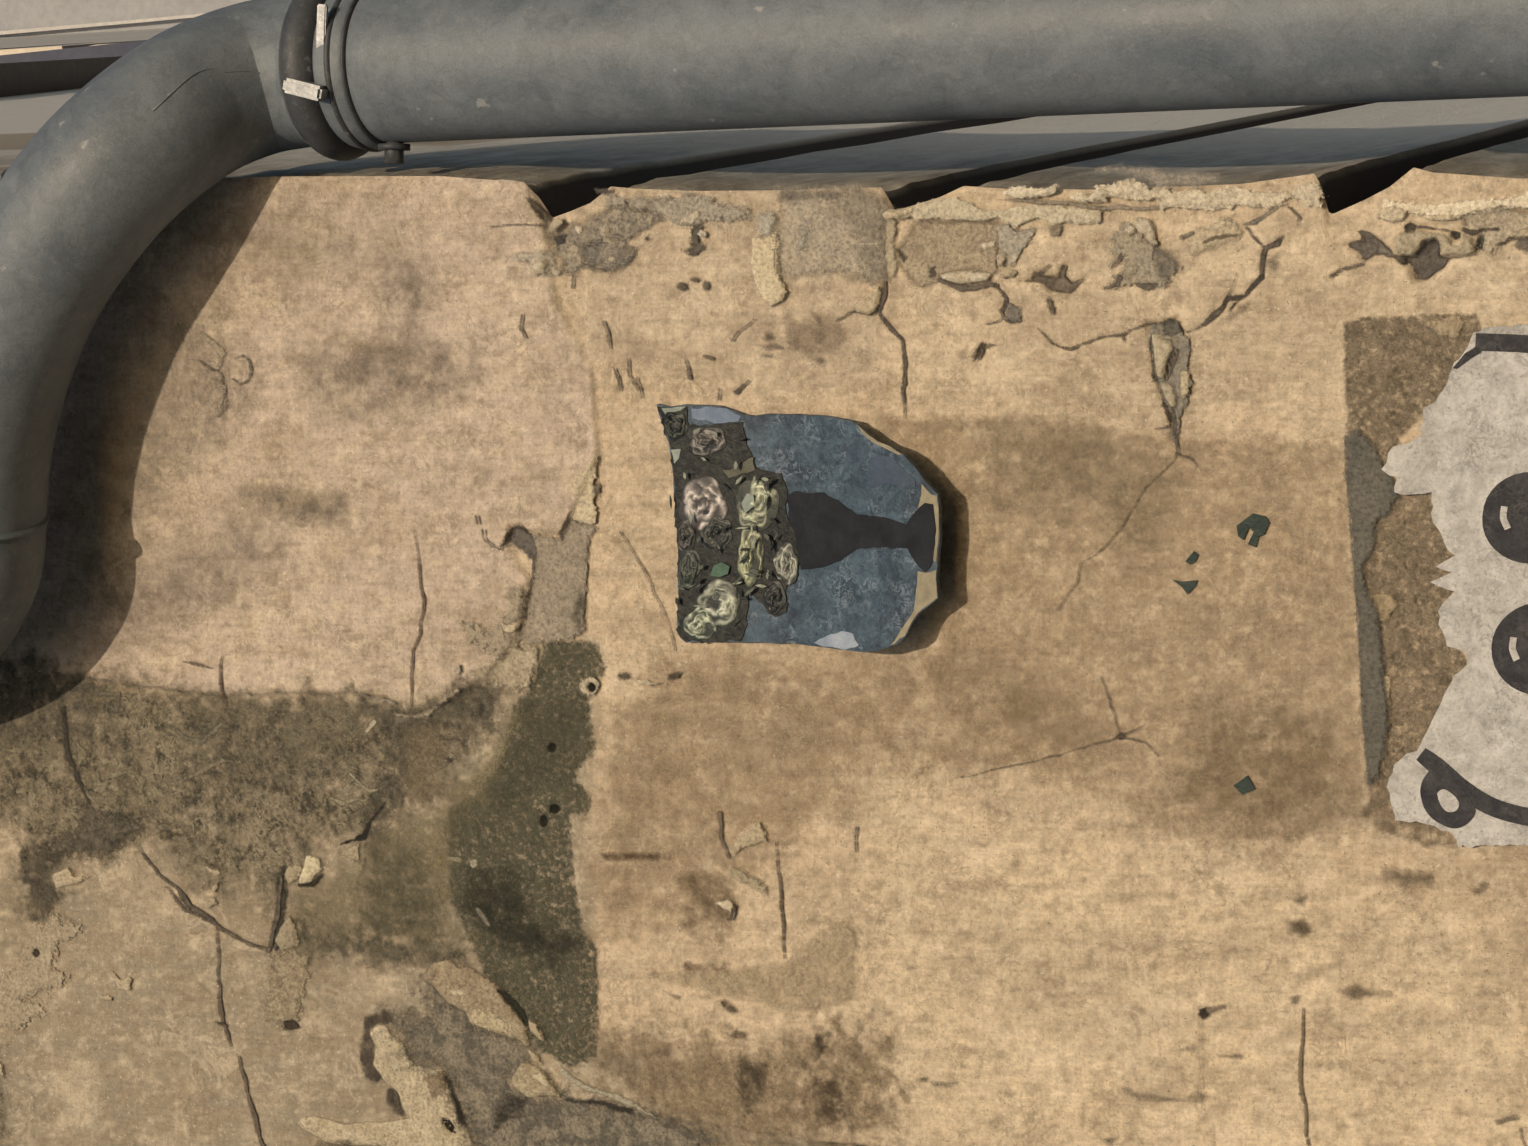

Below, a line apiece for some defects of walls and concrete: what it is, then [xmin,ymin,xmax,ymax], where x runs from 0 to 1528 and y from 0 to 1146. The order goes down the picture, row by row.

crack [492,187,549,230]
crack [518,314,526,338]
crack [835,209,907,415]
spalling [545,167,1324,314]
crack [987,206,1301,351]
spalling [1323,191,1528,280]
peeling [474,511,596,644]
water stain [272,829,465,965]
water stain [470,875,576,961]
crack [141,851,283,1146]
spalling [360,976,719,1146]